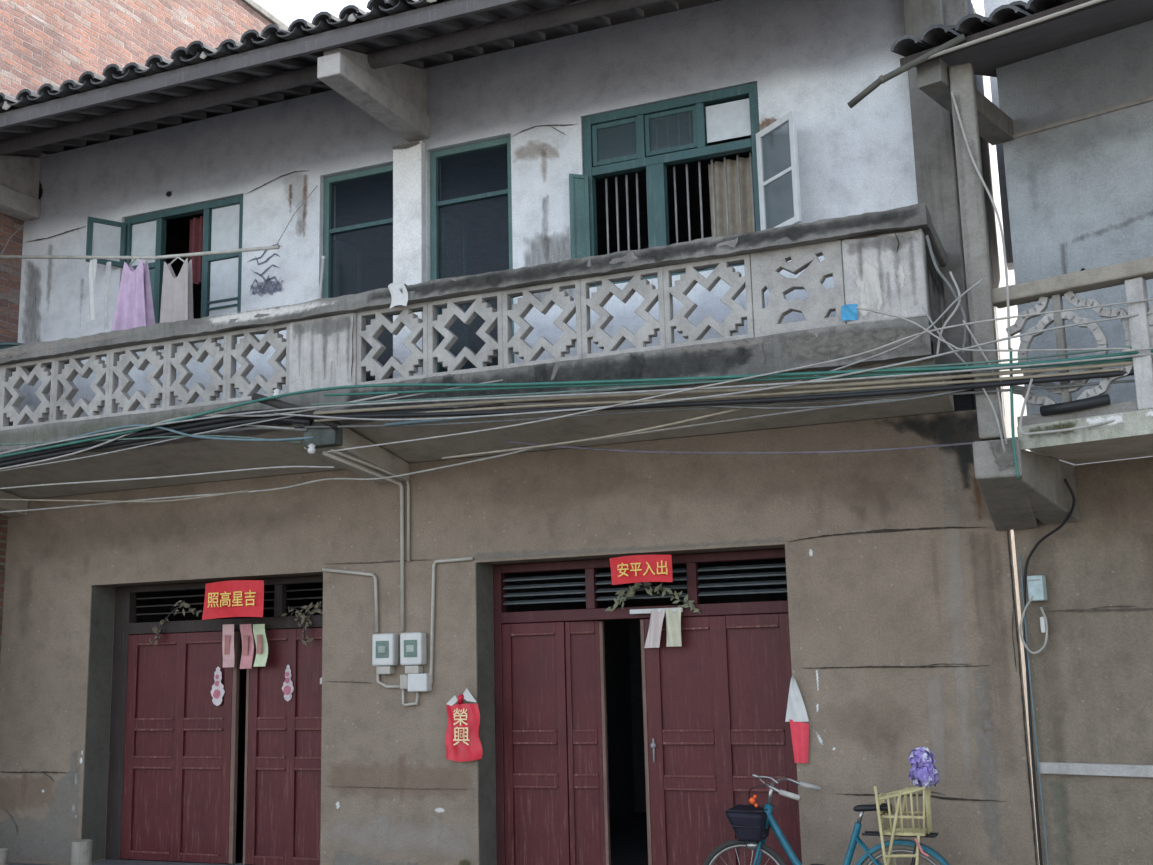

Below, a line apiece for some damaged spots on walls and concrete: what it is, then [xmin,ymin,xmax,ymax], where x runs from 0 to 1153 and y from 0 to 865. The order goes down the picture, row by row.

crack [514,124,573,136]
crack [27,226,85,242]
leakage [372,210,913,299]
crack [1044,604,1153,612]
crack [788,527,1037,865]